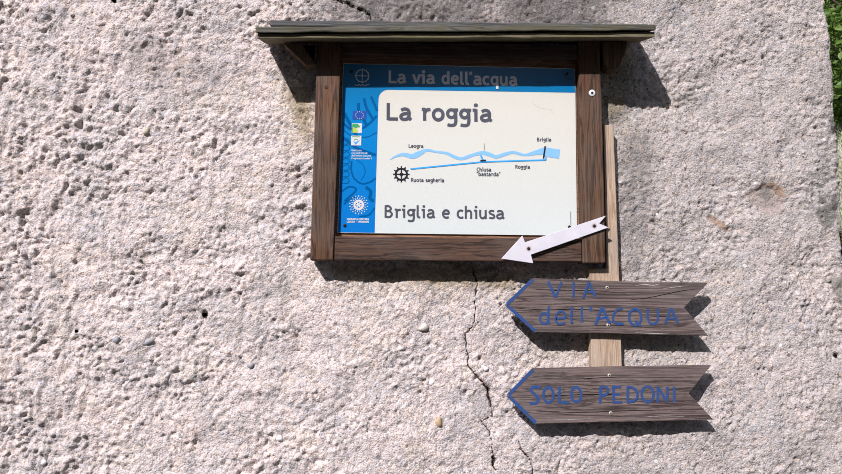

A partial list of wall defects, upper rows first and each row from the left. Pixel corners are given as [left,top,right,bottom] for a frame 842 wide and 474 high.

crack [337,0,382,20]
crack [464,262,496,470]